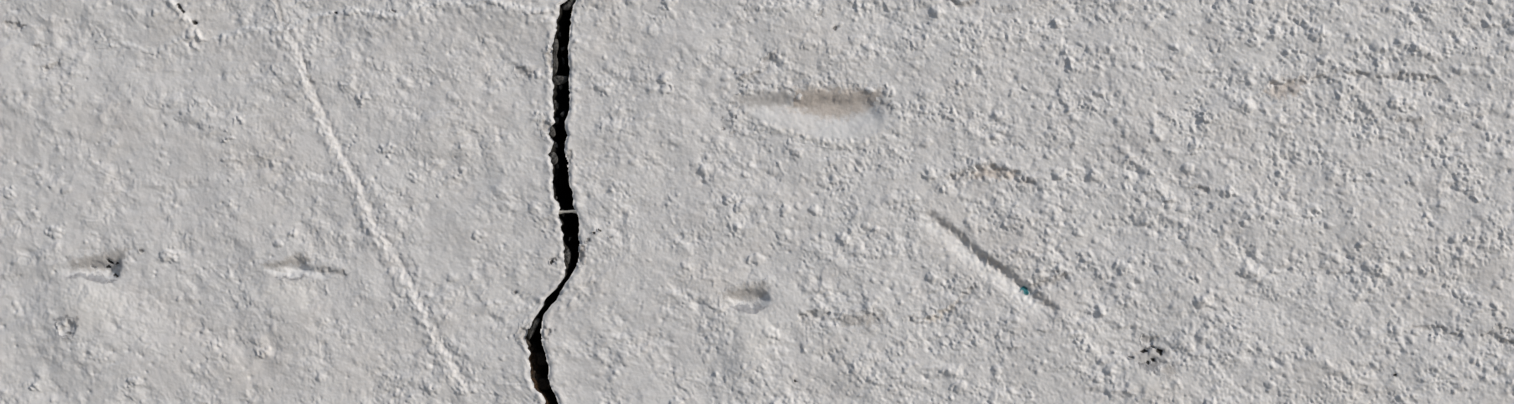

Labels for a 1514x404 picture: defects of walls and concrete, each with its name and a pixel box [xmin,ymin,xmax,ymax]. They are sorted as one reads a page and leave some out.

crack [94,0,588,404]